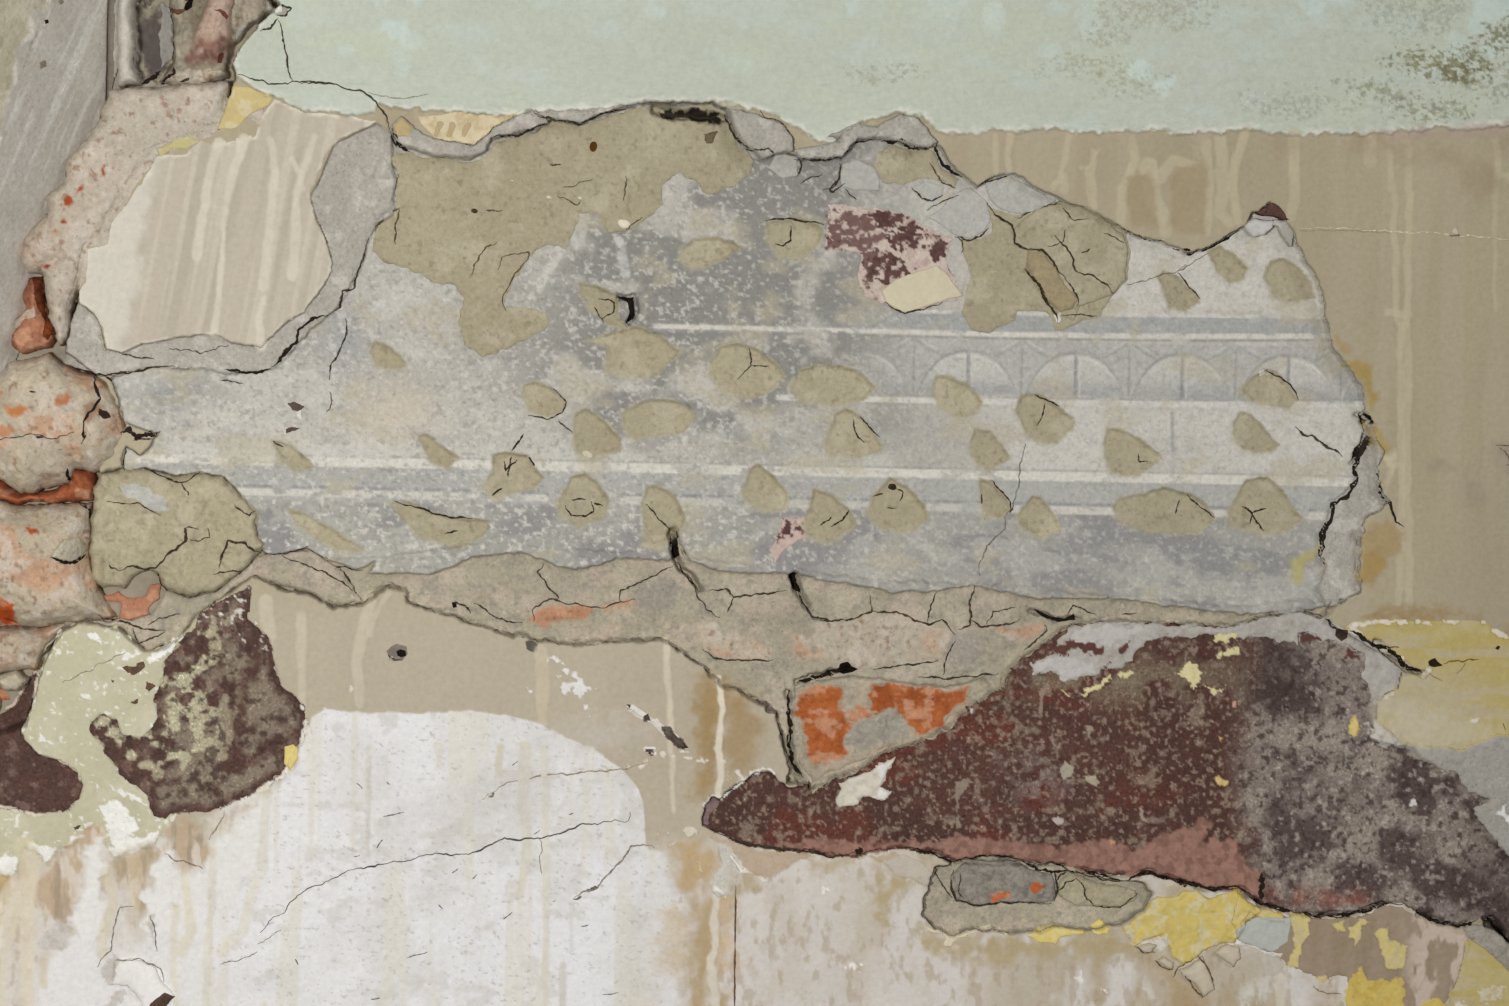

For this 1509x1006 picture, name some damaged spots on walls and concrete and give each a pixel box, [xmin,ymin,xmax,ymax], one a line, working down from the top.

spalling [159,0,292,83]
peeling [218,86,273,129]
damp [1029,0,1509,601]
flaking render [63,99,1404,616]
crack [482,763,645,800]
crack [786,667,847,778]
peeling [324,538,1509,1006]
crack [223,814,652,964]
peeling [99,952,175,1006]